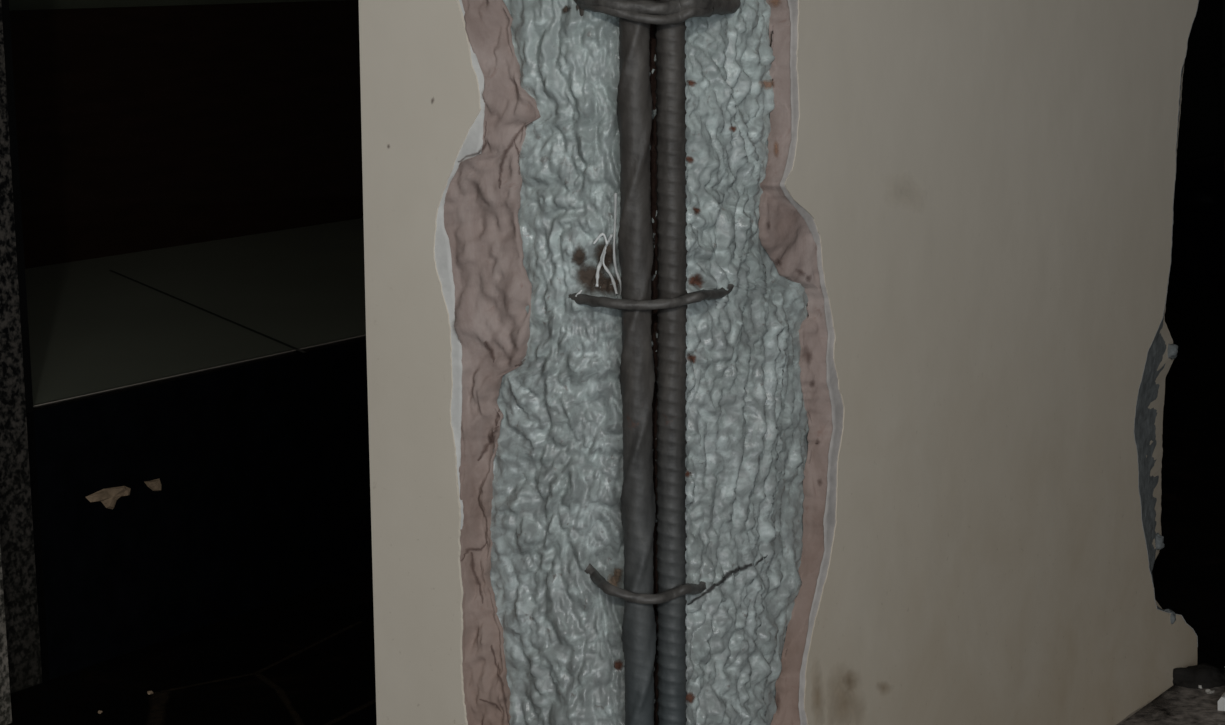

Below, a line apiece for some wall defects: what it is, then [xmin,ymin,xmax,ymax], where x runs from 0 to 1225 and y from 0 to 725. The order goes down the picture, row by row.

corrosion [572,244,619,294]
spalling [434,0,844,725]
spalling [1134,0,1199,647]